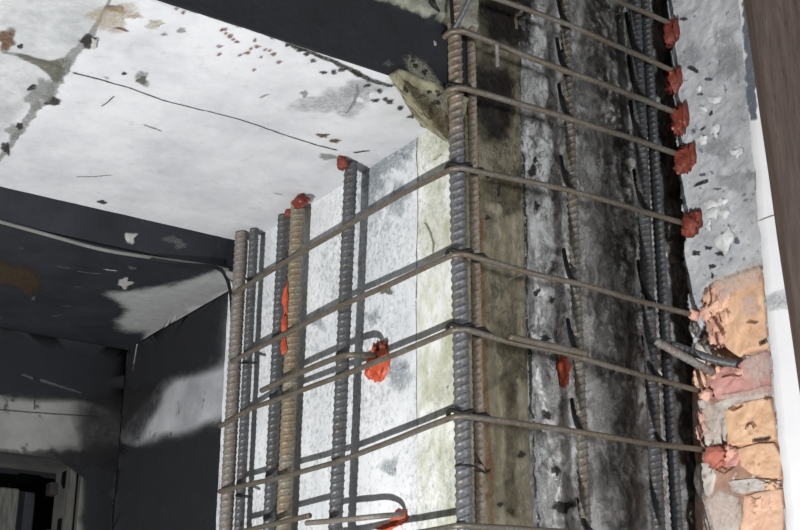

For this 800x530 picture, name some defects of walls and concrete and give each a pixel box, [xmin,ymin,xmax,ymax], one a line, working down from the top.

rust [0,29,23,51]
rust [94,6,139,32]
crack [4,52,336,150]
water stain [405,81,449,135]
water stain [476,60,514,142]
water stain [479,0,533,48]
spalling [263,193,310,530]
spalling [328,155,358,530]
spalling [407,0,491,530]
spalling [551,359,592,530]
spalling [628,0,684,530]
spalling [689,246,786,530]